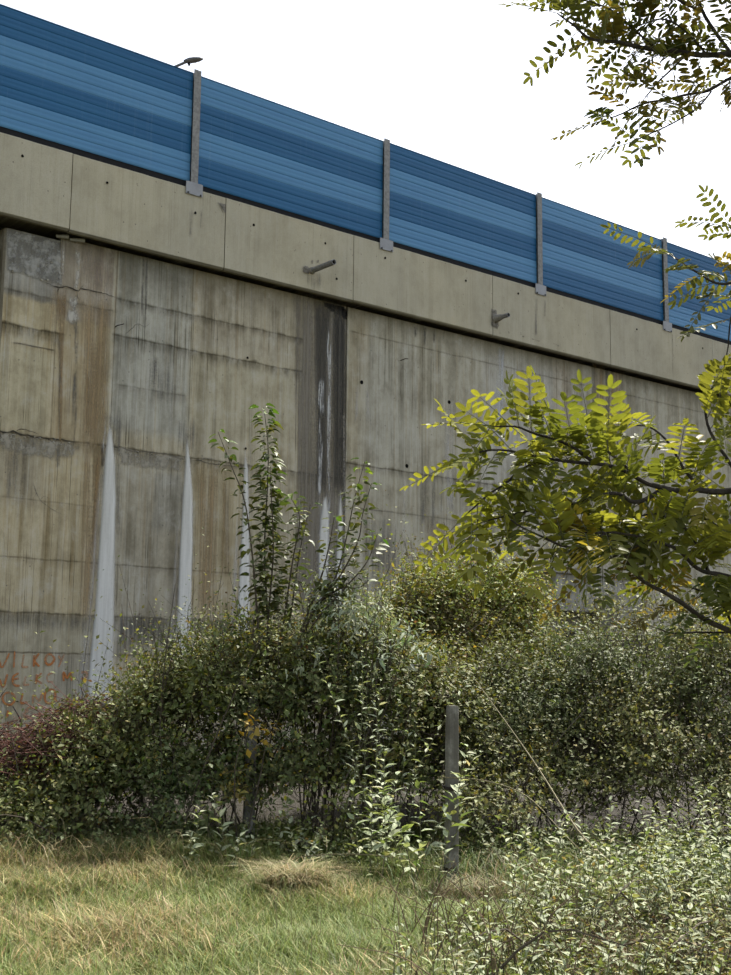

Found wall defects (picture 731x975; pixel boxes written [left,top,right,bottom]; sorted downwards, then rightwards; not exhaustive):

peeling [7,231,64,286]
crack [0,429,73,442]
damp [296,298,345,615]
damp [82,427,210,705]
damp [236,461,250,634]